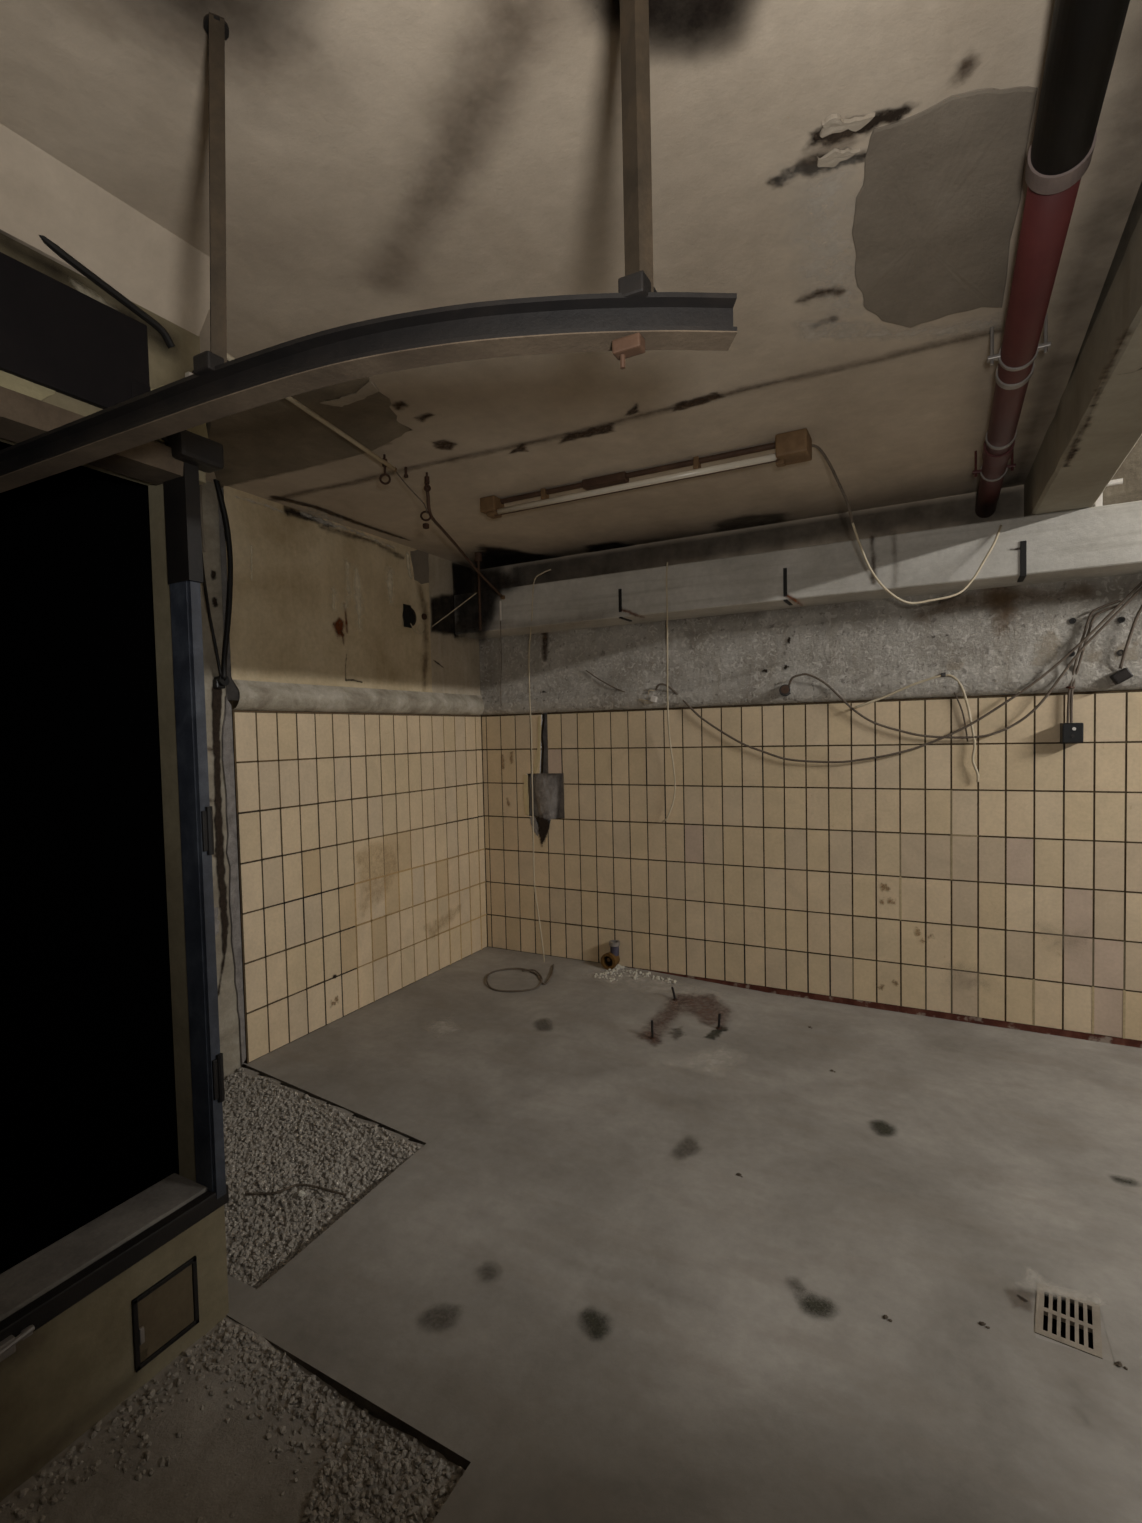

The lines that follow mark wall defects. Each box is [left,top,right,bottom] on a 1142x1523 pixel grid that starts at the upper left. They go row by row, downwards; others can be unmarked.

spalling [768,60,1038,336]
peeling [187,377,412,488]